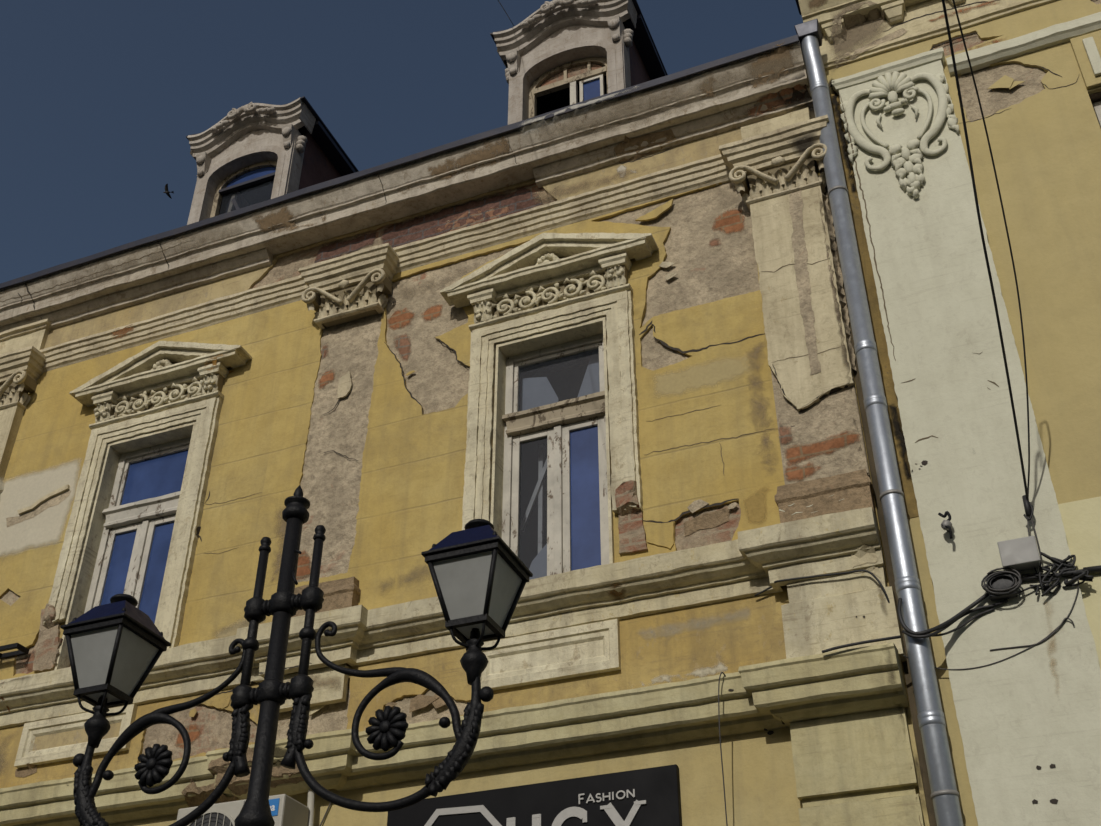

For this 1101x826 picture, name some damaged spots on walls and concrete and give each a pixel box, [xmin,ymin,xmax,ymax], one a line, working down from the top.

spalling [958,63,1046,122]
crack [0,240,193,319]
spalling [596,182,760,371]
peeling [789,190,821,375]
peeling [820,193,856,371]
spalling [296,245,520,582]
crack [639,321,763,354]
spalling [751,346,868,485]
crack [771,347,849,413]
peeling [0,461,79,555]
spalling [615,480,648,555]
spalling [675,489,767,551]